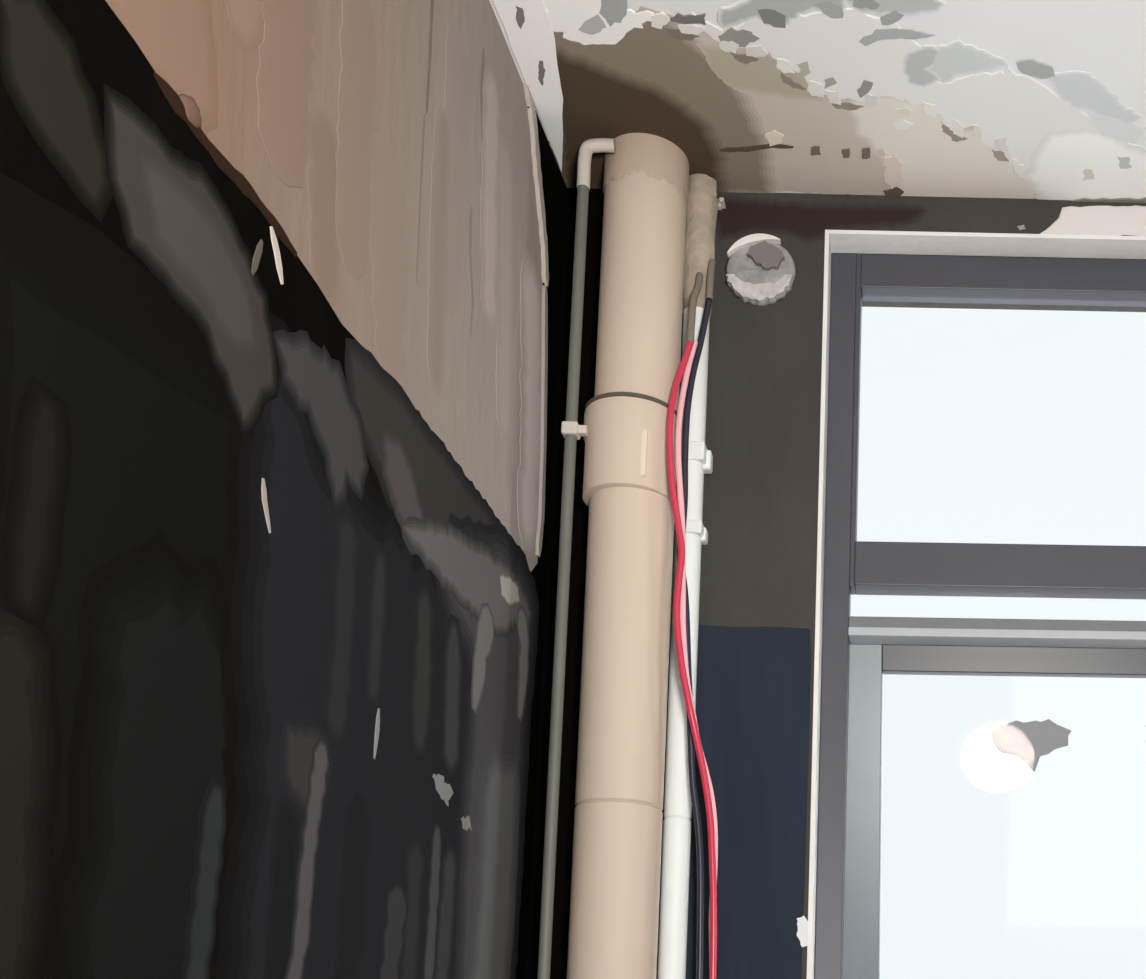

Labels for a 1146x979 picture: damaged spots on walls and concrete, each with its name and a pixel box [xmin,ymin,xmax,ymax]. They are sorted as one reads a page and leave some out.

water stain [548,6,928,243]
peeling [544,0,1146,236]
water stain [0,0,542,979]